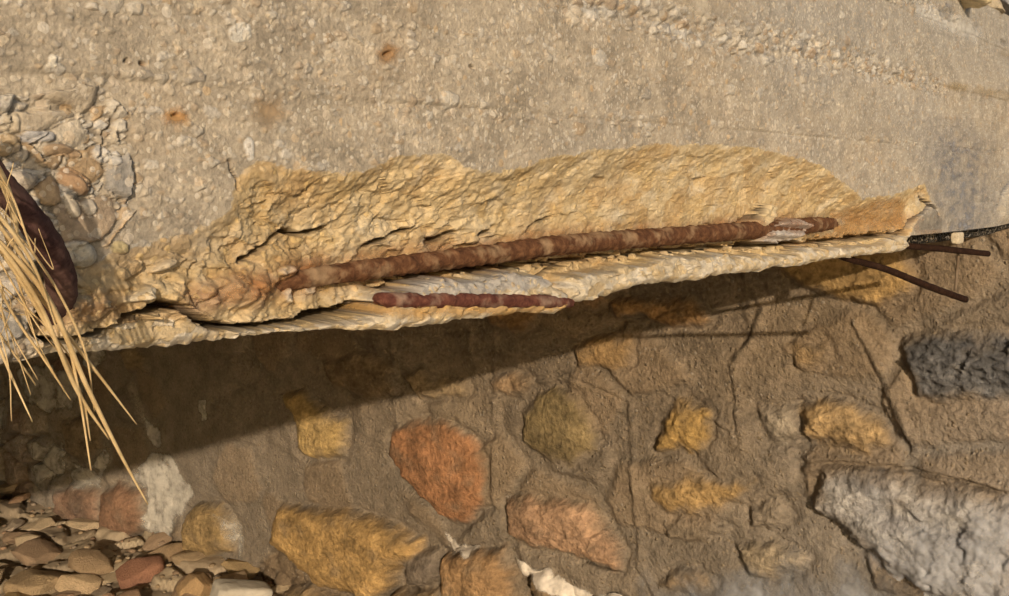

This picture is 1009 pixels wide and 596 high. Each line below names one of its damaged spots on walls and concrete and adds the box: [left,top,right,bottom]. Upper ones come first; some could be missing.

rust [166,110,186,122]
crack [525,216,555,233]
crack [237,226,330,262]
crack [361,227,494,246]
spalling [0,143,991,359]
rust [341,302,566,318]